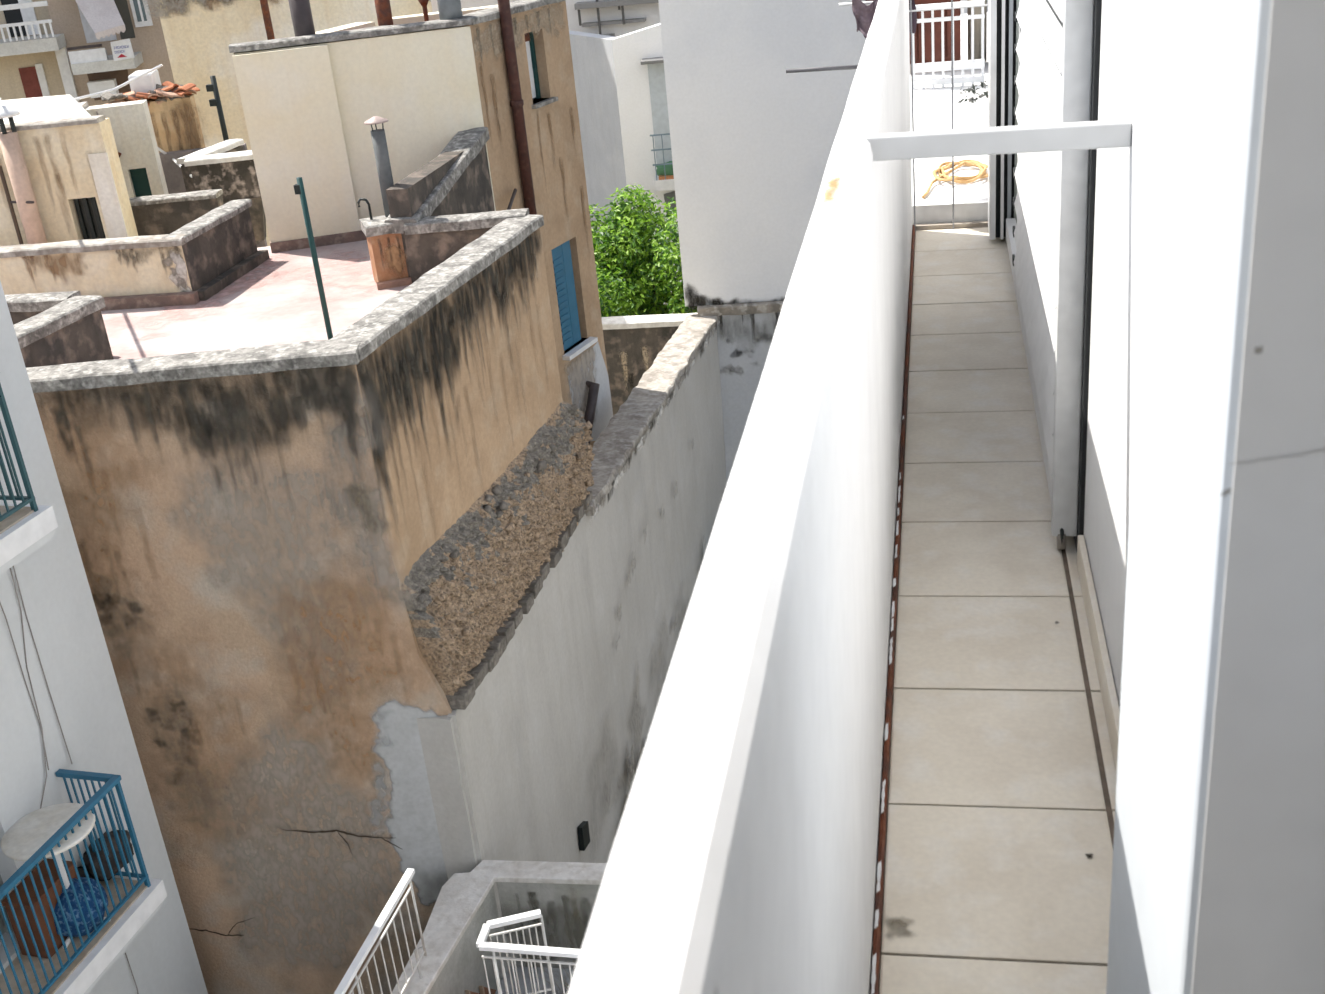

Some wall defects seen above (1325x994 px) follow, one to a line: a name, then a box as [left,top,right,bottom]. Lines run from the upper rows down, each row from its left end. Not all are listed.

leakage [27,253,81,278]
leakage [41,231,540,528]
crack [1229,449,1325,464]
flaking render [396,322,720,710]
crack [281,829,402,854]